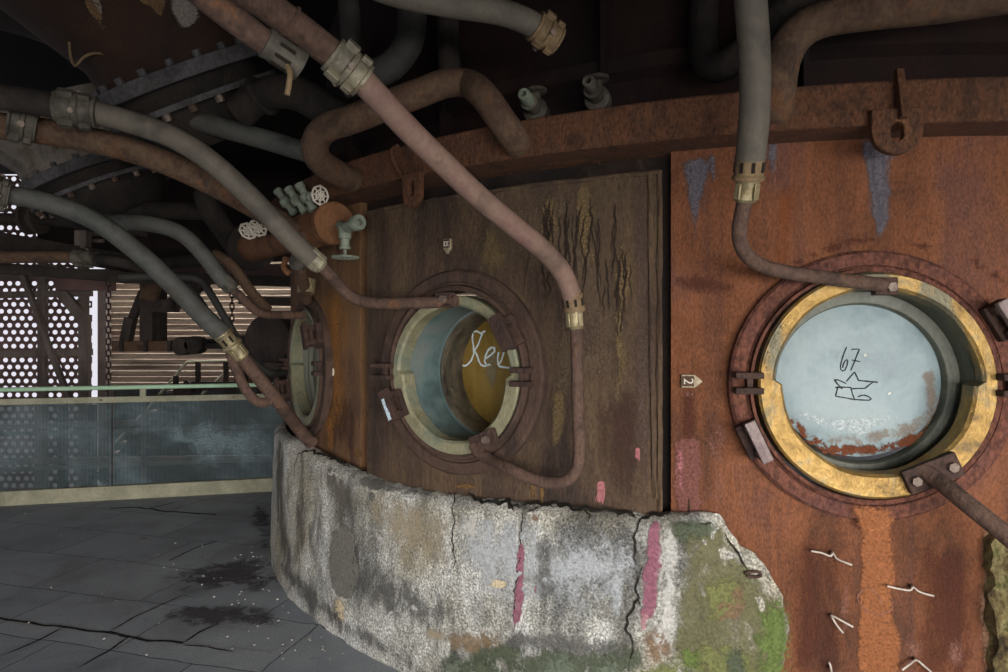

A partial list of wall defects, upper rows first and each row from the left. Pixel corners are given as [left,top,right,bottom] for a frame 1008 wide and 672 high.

corrosion [790,418,928,457]
crack [0,595,288,669]
water stain [165,440,385,652]
crack [451,492,750,672]
corrosion [642,631,670,662]
corrosion [854,506,900,672]